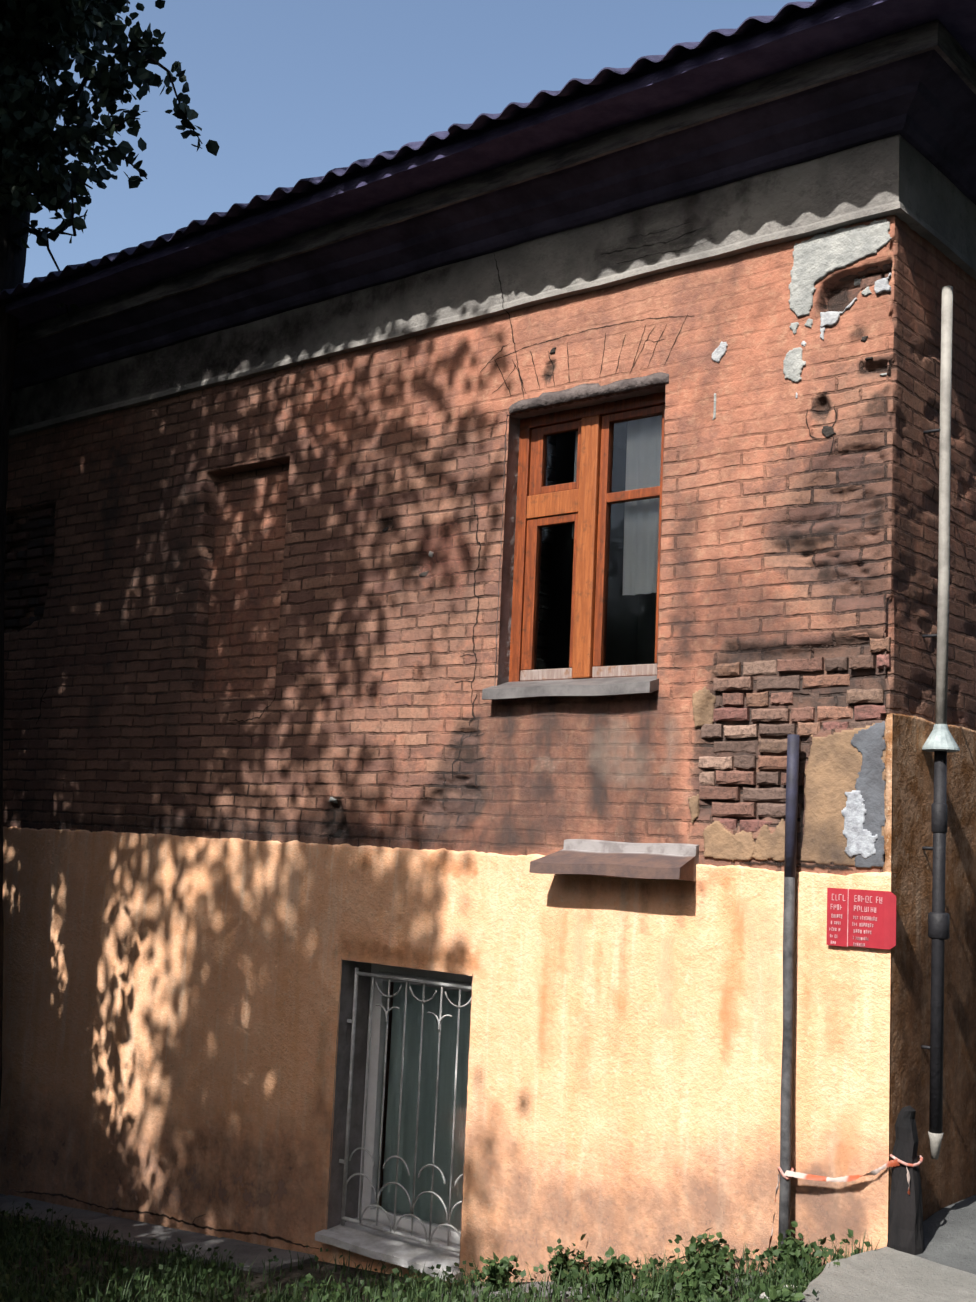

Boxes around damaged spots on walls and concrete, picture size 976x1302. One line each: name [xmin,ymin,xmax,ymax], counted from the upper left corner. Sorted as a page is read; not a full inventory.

peeling [783,219,892,398]
crack [452,499,484,779]
spalling [688,632,891,868]
leakage [1,1116,306,1242]
crack [13,1189,319,1249]